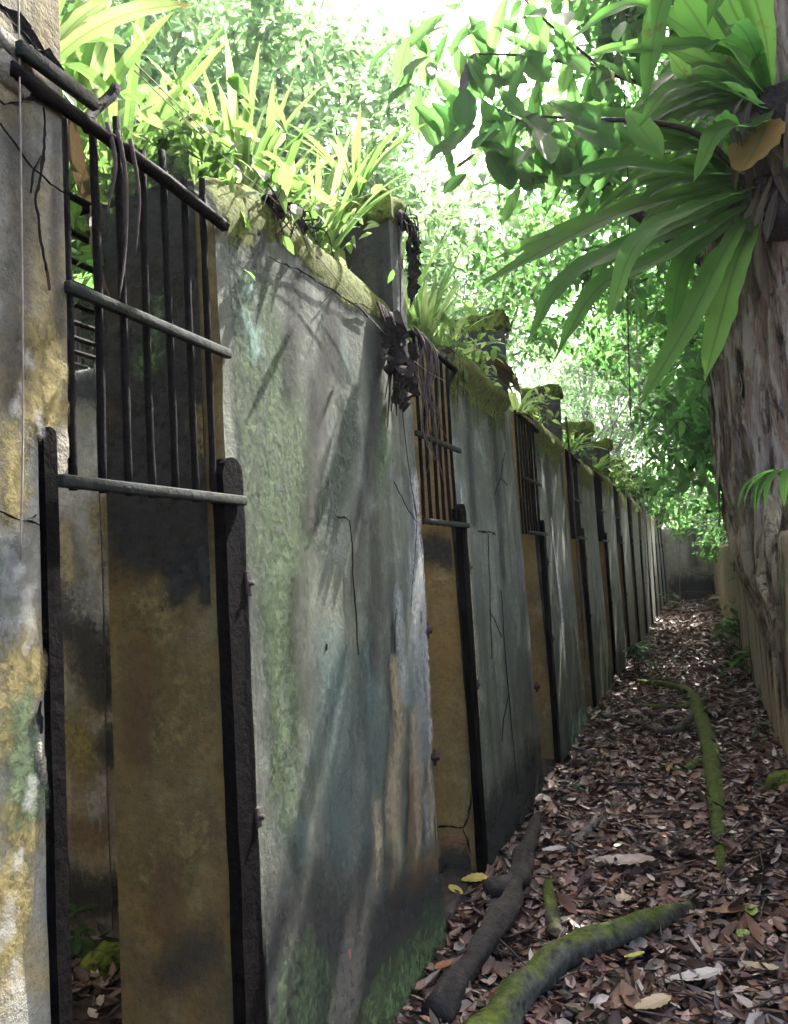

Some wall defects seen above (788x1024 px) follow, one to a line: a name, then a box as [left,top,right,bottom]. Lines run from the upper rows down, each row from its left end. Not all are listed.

water stain [0,112,33,403]
crack [0,107,72,290]
water stain [0,534,28,635]
crack [335,515,359,655]
water stain [236,229,471,1024]
crack [434,795,472,854]